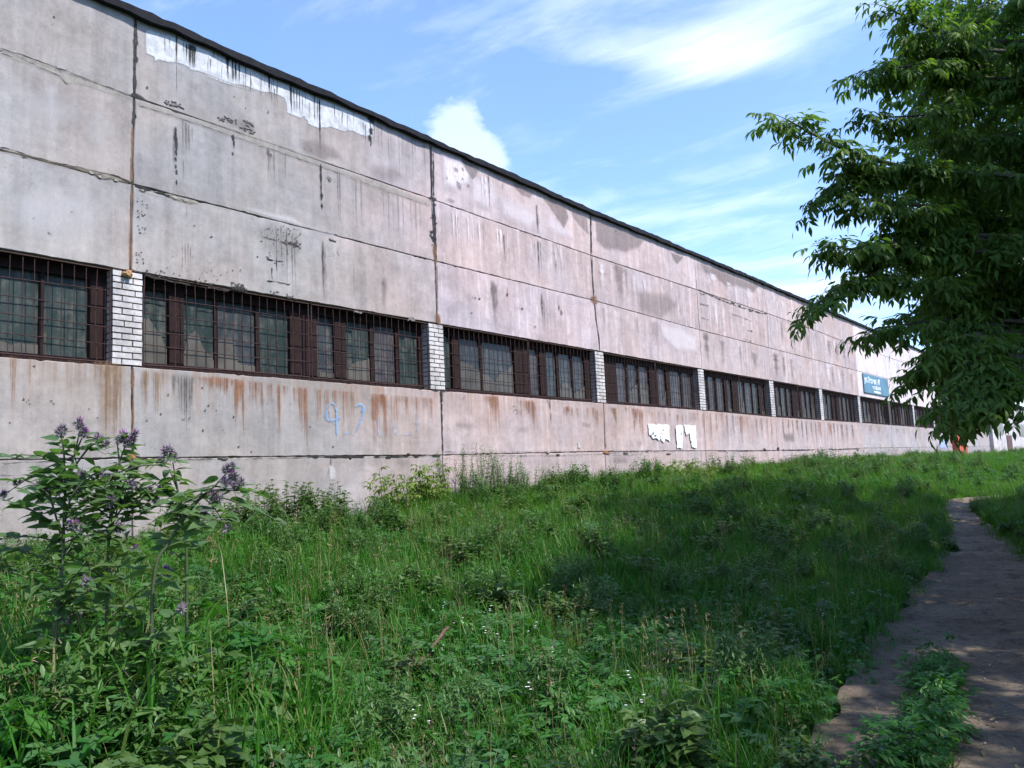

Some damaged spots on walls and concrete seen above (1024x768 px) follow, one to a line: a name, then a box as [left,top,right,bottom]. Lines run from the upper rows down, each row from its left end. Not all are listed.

crack [1,48,131,97]
peeling [135,30,375,137]
crack [0,147,131,182]
leakage [431,147,569,260]
leakage [591,220,641,292]
corrosion [106,366,134,432]
corrosion [218,378,244,411]